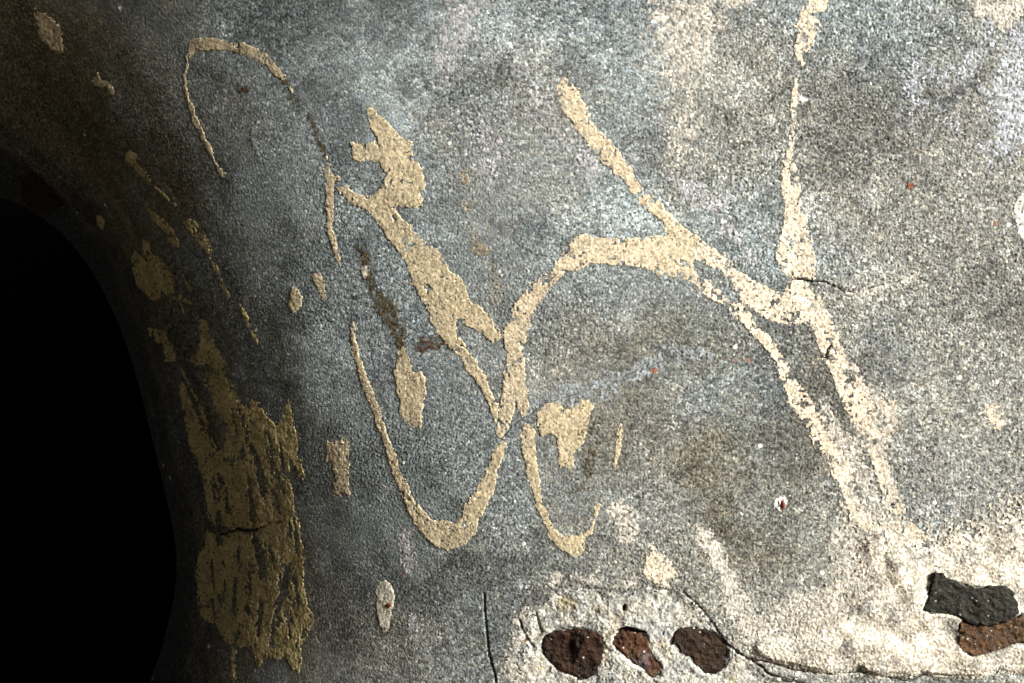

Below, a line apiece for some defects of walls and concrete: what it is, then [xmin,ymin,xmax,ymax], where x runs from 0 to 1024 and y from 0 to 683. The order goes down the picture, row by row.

crack [791,278,902,293]
crack [220,521,282,536]
crack [482,574,535,683]